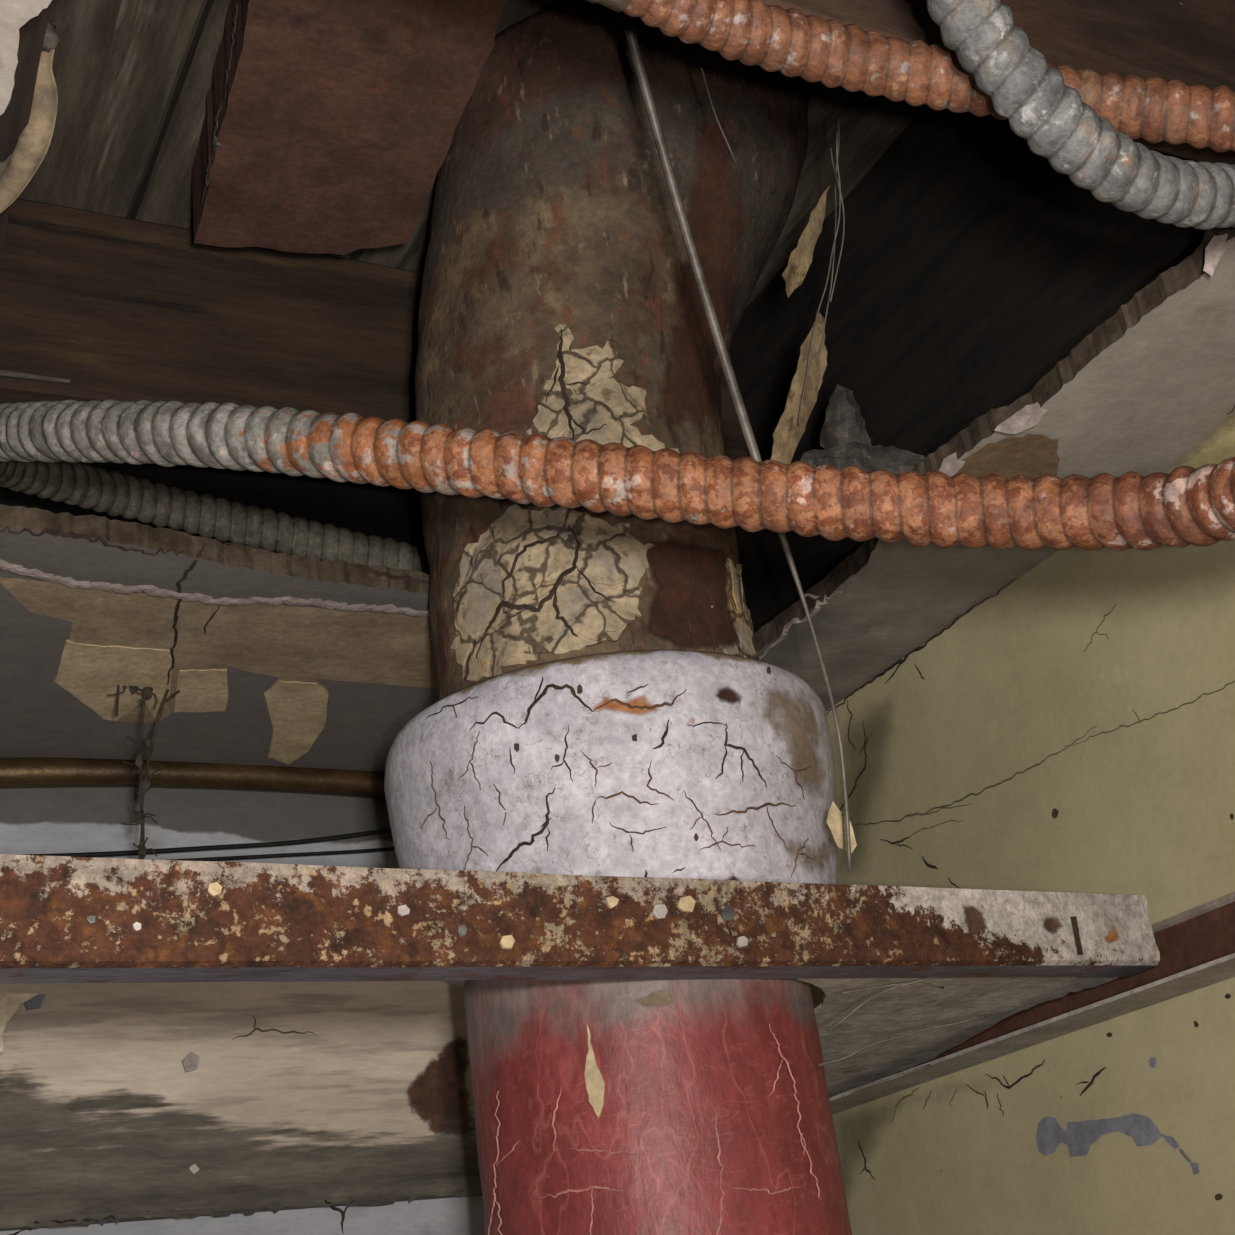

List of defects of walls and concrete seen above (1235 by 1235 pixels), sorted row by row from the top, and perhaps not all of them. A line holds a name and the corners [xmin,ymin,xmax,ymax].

peeling [0,21,61,213]
corrosion [663,125,743,423]
peeling [525,324,682,454]
peeling [770,311,827,465]
crack [0,526,245,685]
peeling [0,559,438,765]
peeling [450,504,656,682]
crack [421,676,814,877]
crack [826,578,1235,888]
corrosion [965,906,986,934]
damp [0,1074,483,1229]
crack [488,1091,519,1235]